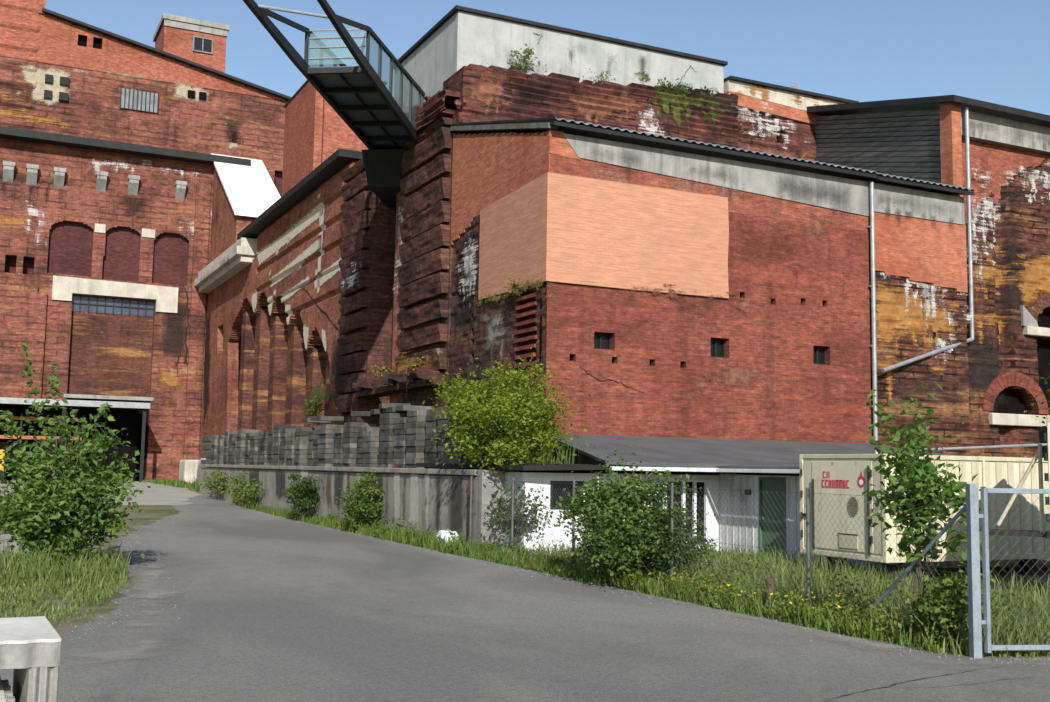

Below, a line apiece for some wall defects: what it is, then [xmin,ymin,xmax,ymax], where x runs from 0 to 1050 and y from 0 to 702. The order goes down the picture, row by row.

leakage [736,101,796,149]
leakage [967,164,1050,279]
leakage [455,226,479,307]
leakage [903,277,973,361]